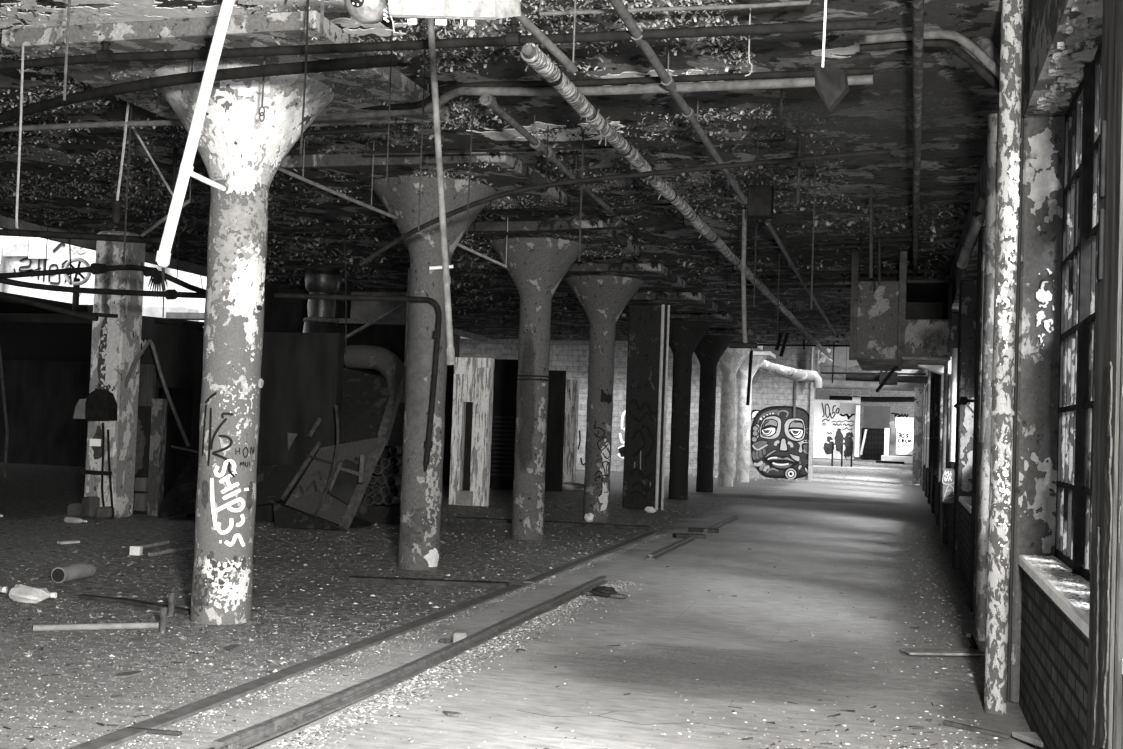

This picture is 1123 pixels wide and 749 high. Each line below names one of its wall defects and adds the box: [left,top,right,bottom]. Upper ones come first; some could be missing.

peeling [1037,0,1103,113]
peeling [0,0,968,444]
peeling [996,128,1062,365]
peeling [92,421,115,464]
spalling [201,480,209,509]
peeling [401,329,442,567]
peeling [534,383,547,535]
spalling [823,429,854,460]
peeling [940,397,974,492]
peeling [994,431,1057,568]
peeling [193,550,252,616]